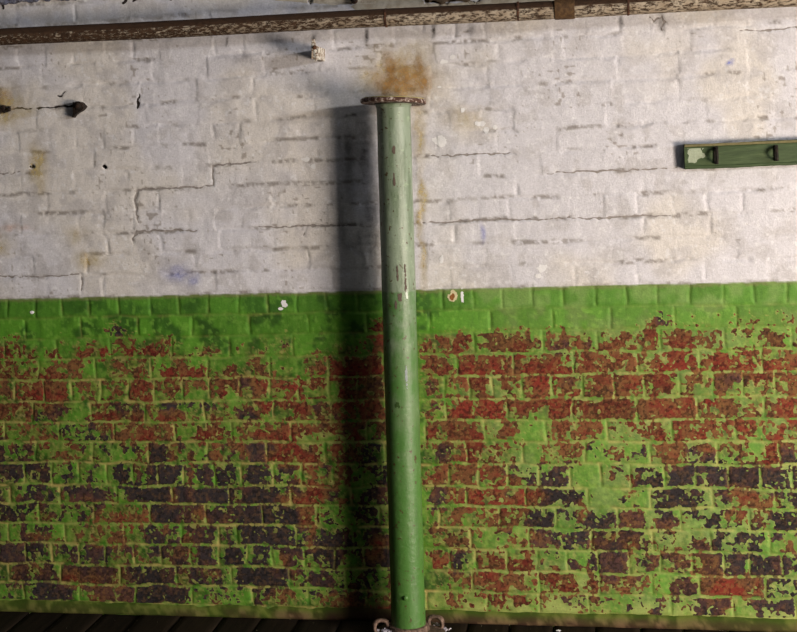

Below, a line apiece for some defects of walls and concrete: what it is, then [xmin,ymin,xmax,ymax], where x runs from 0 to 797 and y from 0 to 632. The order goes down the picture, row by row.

crack [12,91,72,110]
corrosion [377,59,428,96]
peeling [0,317,391,609]
peeling [419,310,797,618]